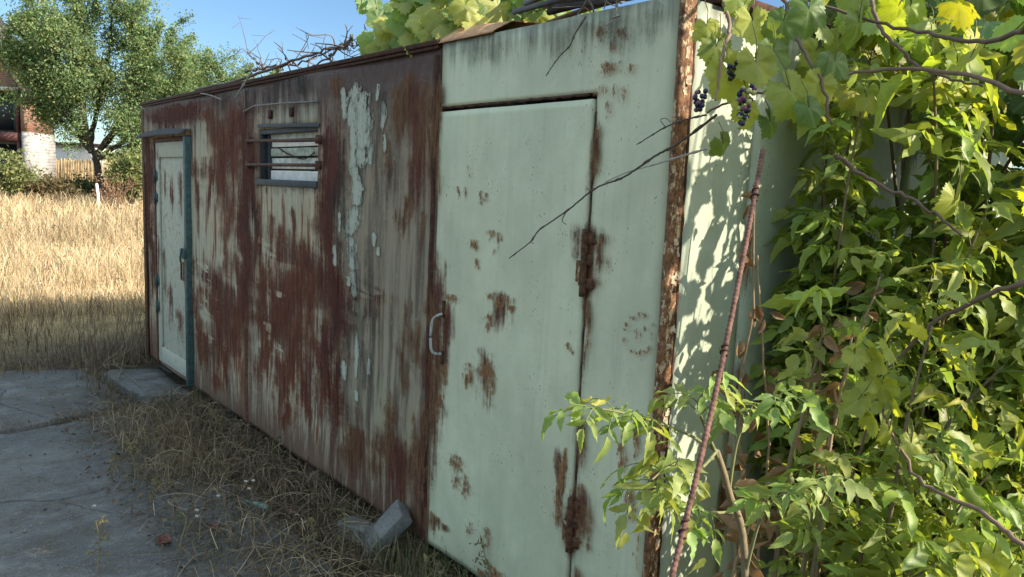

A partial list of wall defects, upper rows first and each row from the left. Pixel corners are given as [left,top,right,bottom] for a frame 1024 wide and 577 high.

corrosion [143,77,471,535]
peeling [340,331,372,402]
peeling [332,79,387,298]
corrosion [381,25,633,404]
corrosion [552,418,592,577]